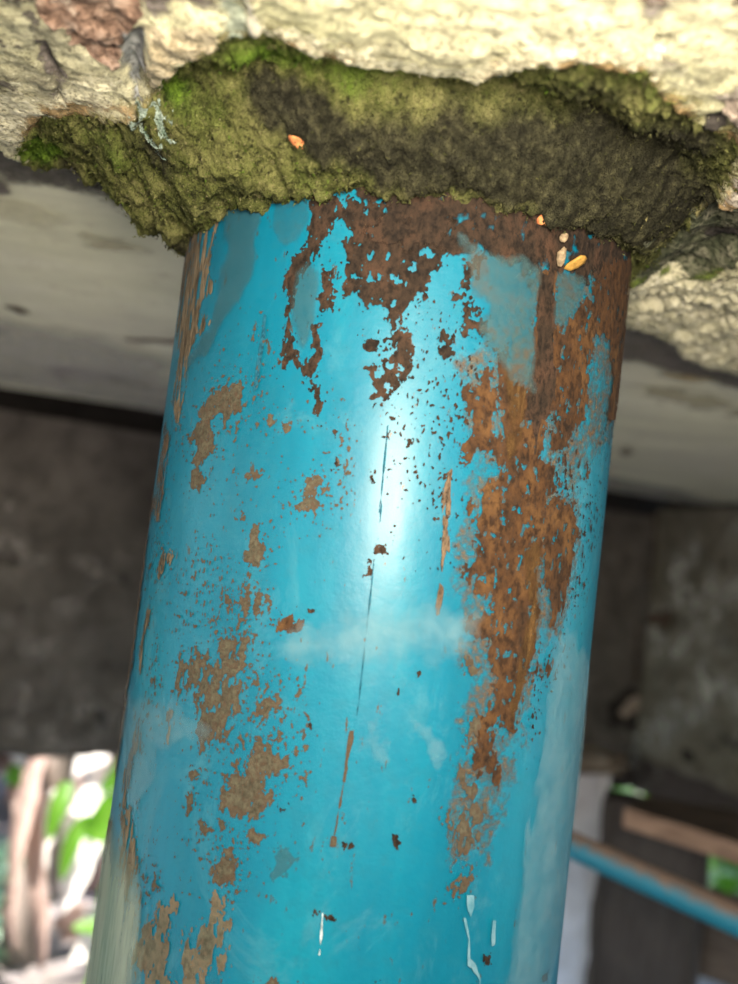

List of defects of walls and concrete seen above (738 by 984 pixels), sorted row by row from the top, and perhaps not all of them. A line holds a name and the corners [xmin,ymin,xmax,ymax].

water stain [145,0,170,17]
water stain [189,0,247,39]
spalling [0,0,219,205]
water stain [119,26,177,160]
peeling [723,179,738,208]
peeling [357,329,500,540]
peeling [105,194,358,984]
peeling [362,525,396,578]
corrosion [332,187,632,909]